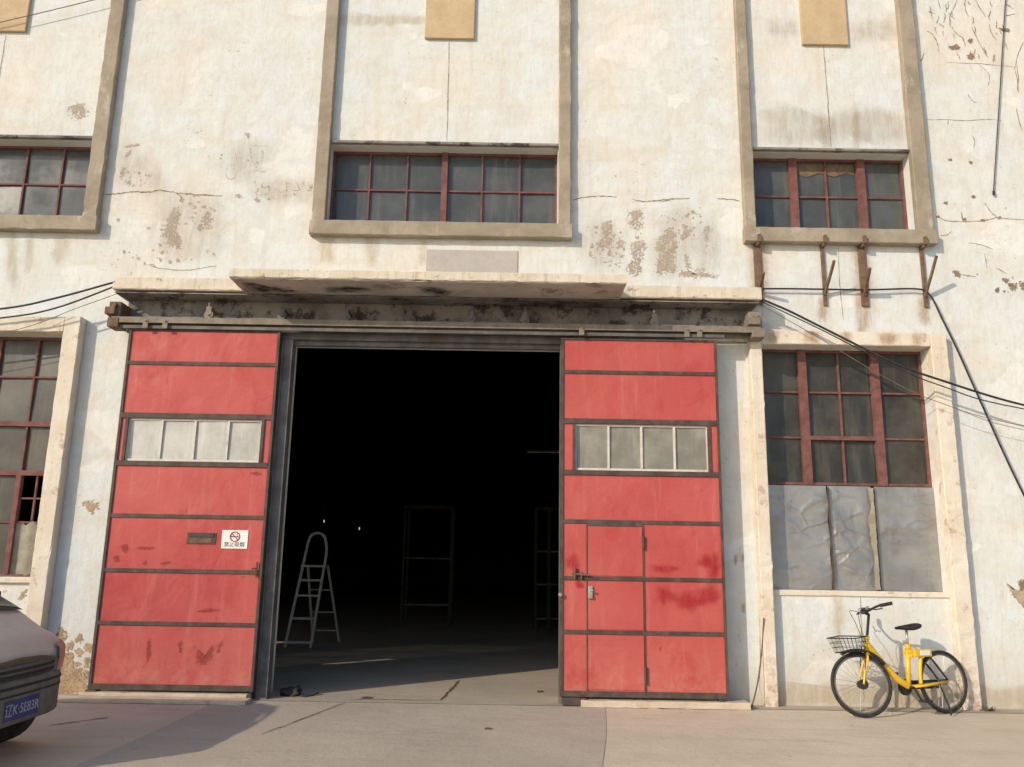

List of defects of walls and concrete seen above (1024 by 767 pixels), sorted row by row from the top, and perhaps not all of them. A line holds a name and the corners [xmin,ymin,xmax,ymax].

peeling [67,100,89,121]
crack [823,46,831,142]
crack [920,0,1023,146]
crack [105,189,222,199]
peeling [122,192,216,265]
crack [574,194,689,202]
peeling [589,209,716,279]
crack [939,203,1024,277]
spalling [82,500,99,515]
spalling [1007,579,1024,608]
spalling [56,625,92,694]